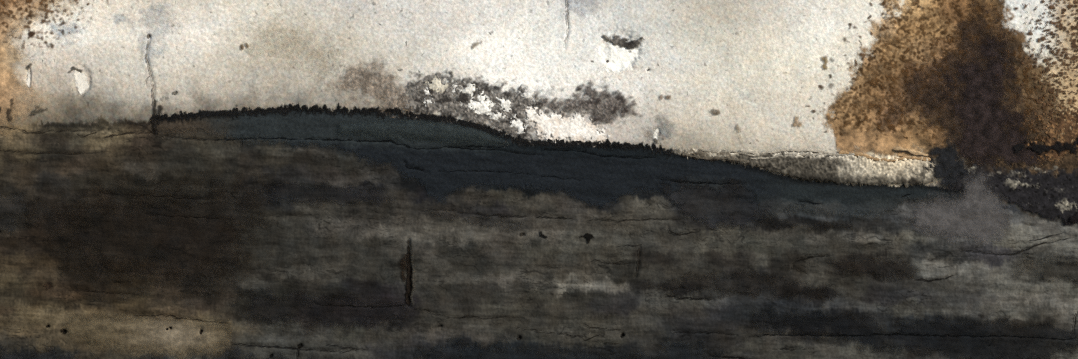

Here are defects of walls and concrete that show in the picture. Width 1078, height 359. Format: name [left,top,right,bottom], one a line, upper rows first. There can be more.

corrosion [0,0,89,124]
crack [146,40,155,104]
corrosion [812,0,1078,169]
crack [0,126,741,184]
water stain [151,62,1078,244]
water stain [245,288,410,333]
crack [320,240,618,344]
water stain [415,337,725,359]
water stain [650,269,1078,359]
water stain [830,255,918,281]
crack [674,312,1078,359]
water stain [1013,255,1078,289]